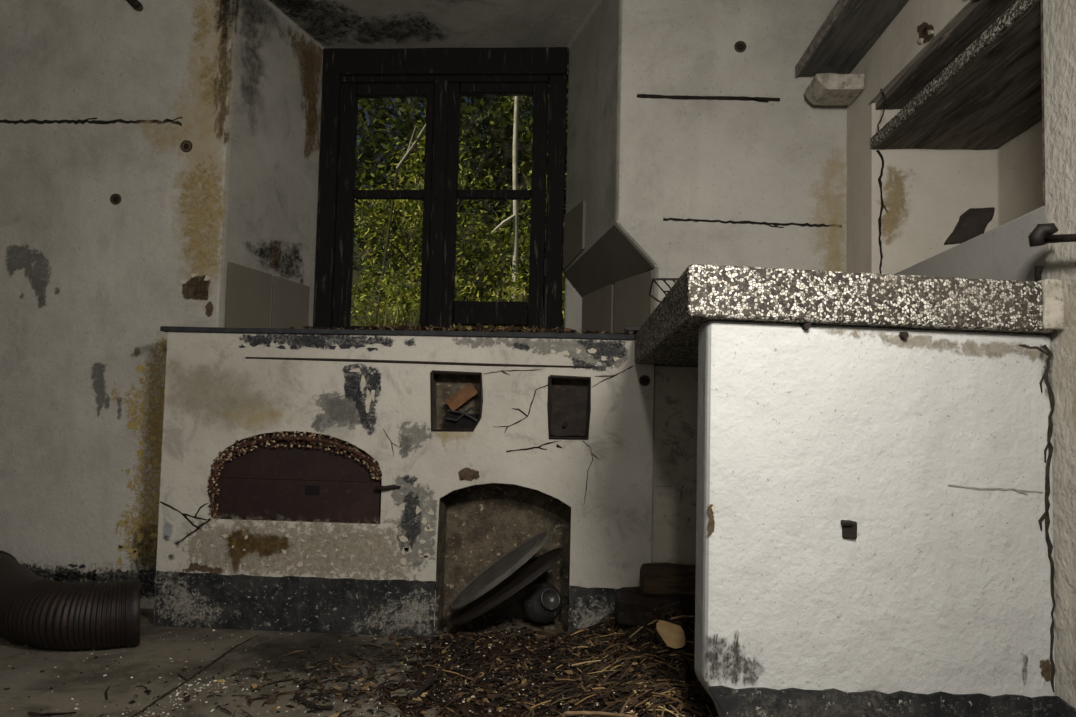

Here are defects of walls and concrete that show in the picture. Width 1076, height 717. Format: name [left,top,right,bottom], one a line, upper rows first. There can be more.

leakage [270,0,442,46]
crack [0,117,183,126]
crack [876,89,891,274]
flaking render [180,274,214,317]
peeling [239,334,415,351]
crack [593,366,633,387]
crack [485,369,598,503]
flaking render [22,337,438,599]
crack [948,344,1056,692]
leakage [704,635,760,686]